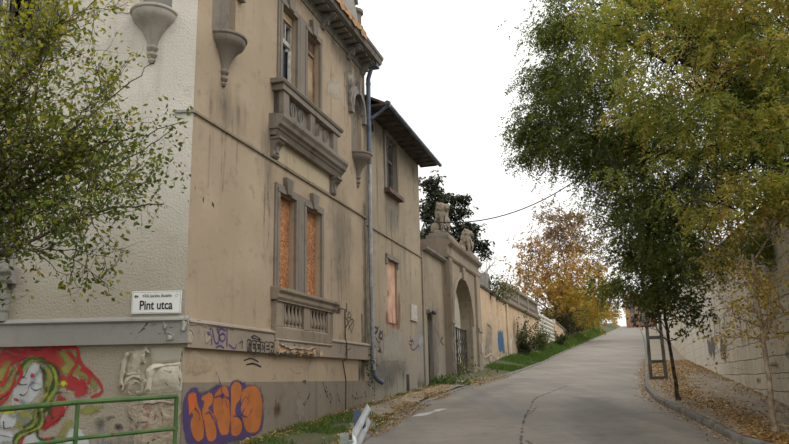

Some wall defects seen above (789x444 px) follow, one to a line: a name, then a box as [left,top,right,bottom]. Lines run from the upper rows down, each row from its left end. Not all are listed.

spalling [114,0,140,13]
crack [519,385,568,444]